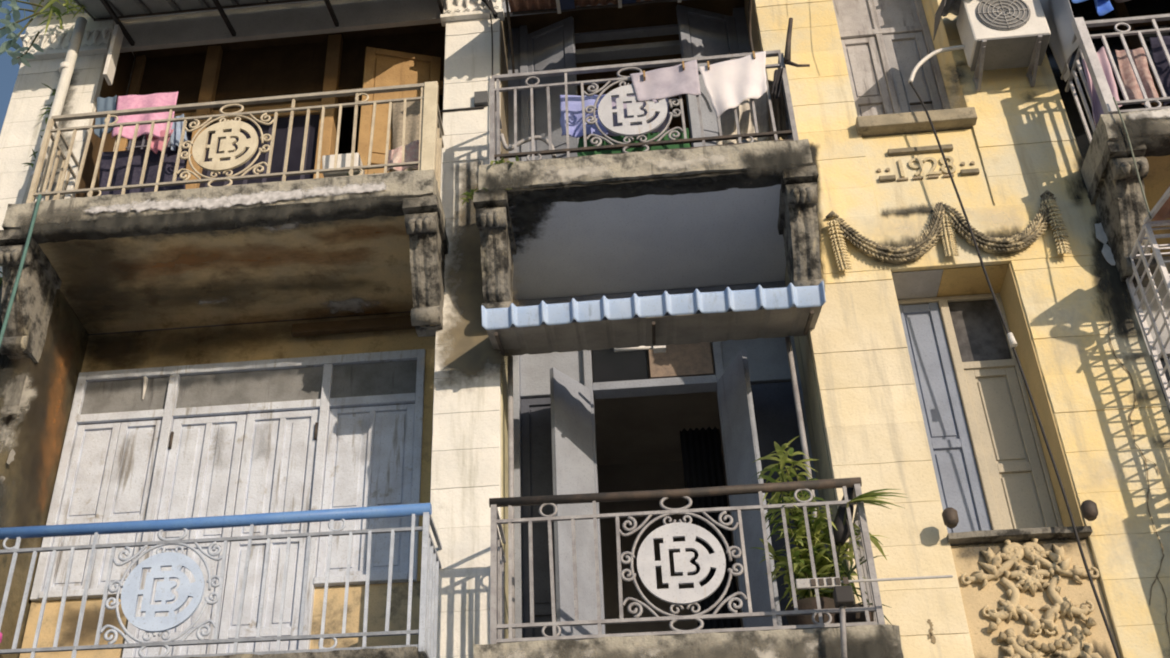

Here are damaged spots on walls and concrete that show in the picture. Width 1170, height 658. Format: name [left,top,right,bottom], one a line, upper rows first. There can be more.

water stain [20,74,418,324]
mould [1071,120,1095,204]
water stain [439,144,824,385]
mould [1093,217,1141,337]
water stain [93,327,291,362]
crack [1107,307,1170,642]
water stain [508,631,893,658]